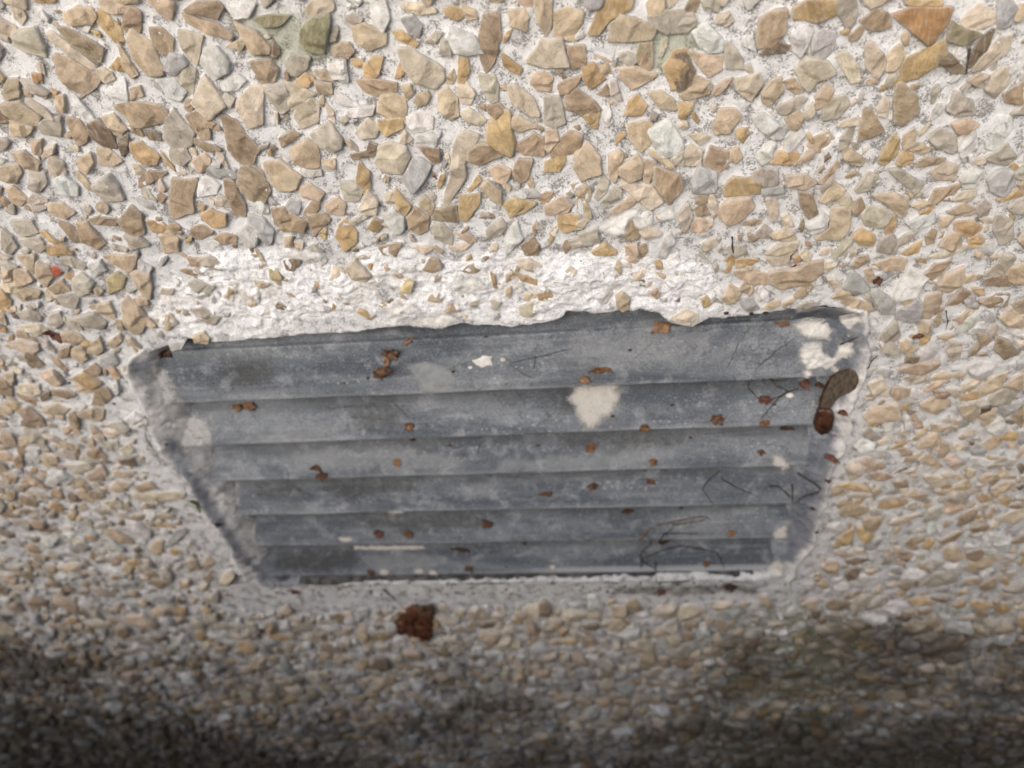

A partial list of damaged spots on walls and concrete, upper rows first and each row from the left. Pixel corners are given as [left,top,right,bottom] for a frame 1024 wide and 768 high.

damp [791,308,867,374]